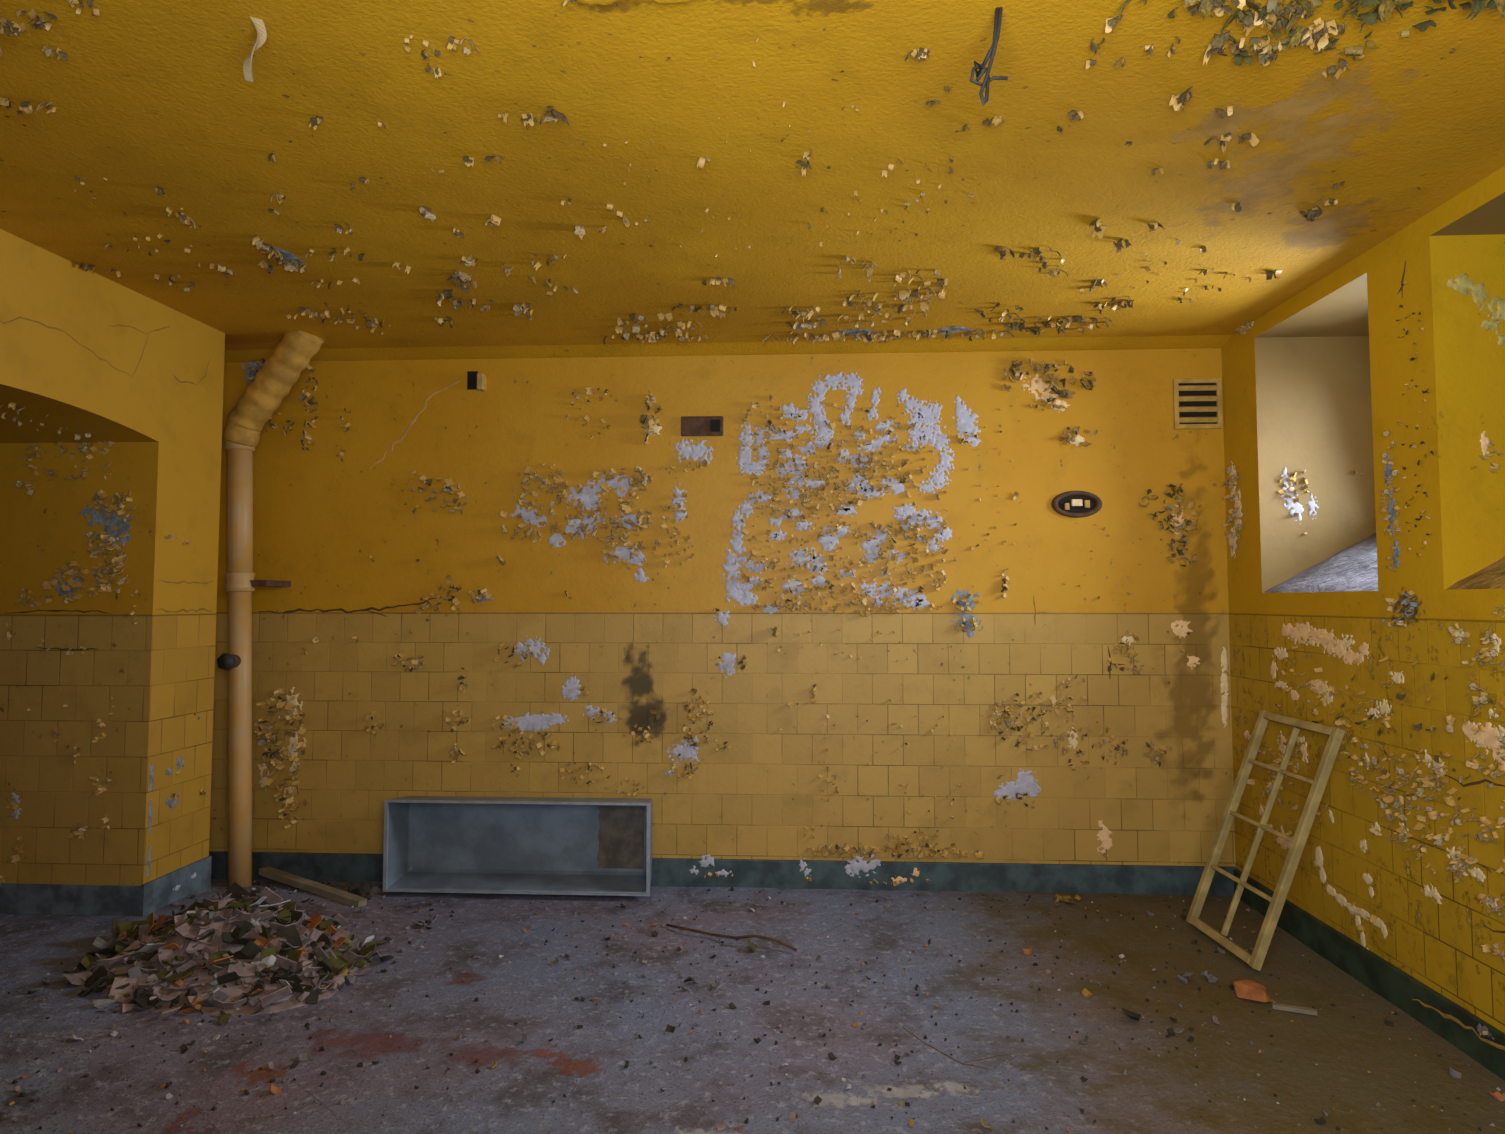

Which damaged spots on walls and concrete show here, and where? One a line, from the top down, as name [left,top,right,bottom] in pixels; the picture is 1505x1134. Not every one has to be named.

peeling [1168,0,1505,80]
peeling [763,154,1167,345]
peeling [603,277,737,345]
peeling [1001,358,1098,446]
peeling [0,402,138,624]
peeling [500,387,713,583]
peeling [713,372,1017,666]
peeling [492,675,731,796]
peeling [994,768,1041,808]
peeling [1220,647,1229,727]
peeling [1244,605,1505,916]
peeling [1313,846,1388,950]